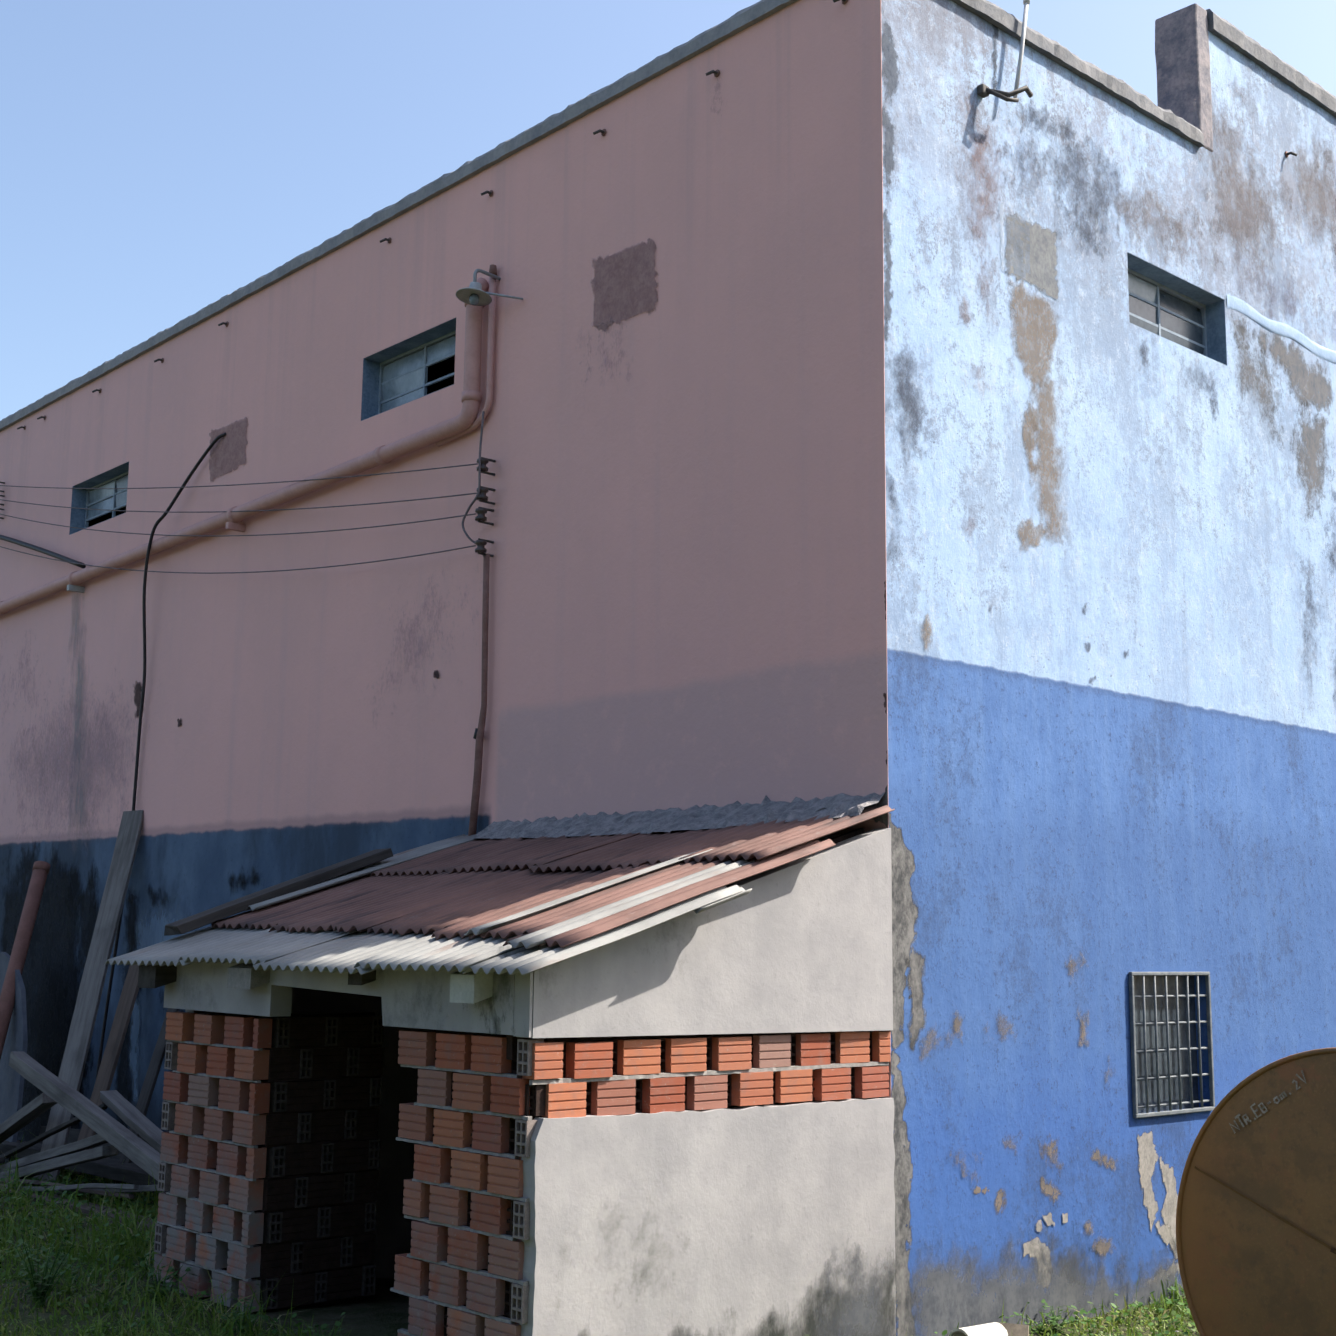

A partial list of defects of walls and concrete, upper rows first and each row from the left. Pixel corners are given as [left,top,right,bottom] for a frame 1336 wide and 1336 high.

flaking render [592,239,657,331]
flaking render [1005,213,1059,299]
damp [1,847,99,1077]
damp [115,886,191,1102]
damp [22,1078,44,1108]
spalling [872,785,962,1336]
peeling [950,1155,1007,1213]
peeling [1091,1149,1116,1169]
peeling [1137,1131,1180,1283]
damp [755,1241,1185,1336]